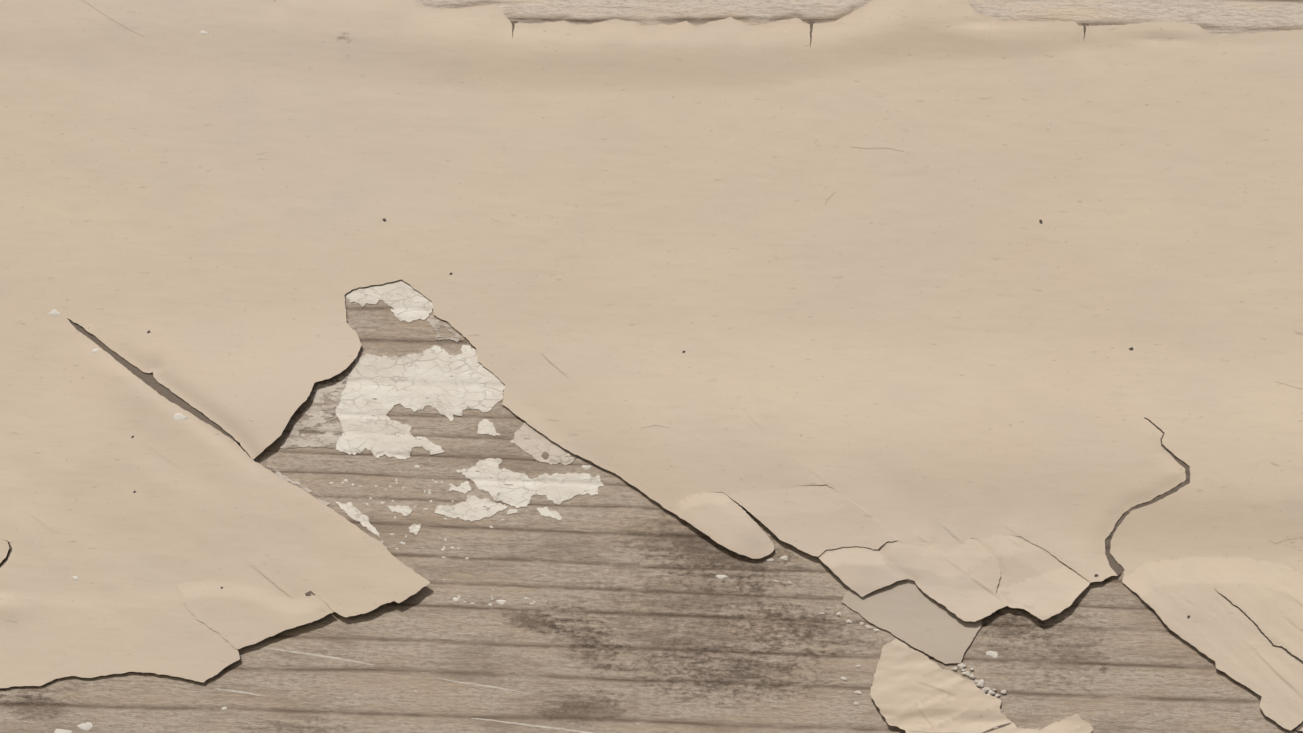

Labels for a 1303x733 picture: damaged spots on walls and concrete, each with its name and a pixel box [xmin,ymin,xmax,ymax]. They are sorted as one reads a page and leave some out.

peeling [416,0,873,27]
peeling [968,0,1303,36]
crack [68,319,238,443]
peeling [0,279,1303,733]
crack [1105,417,1190,577]